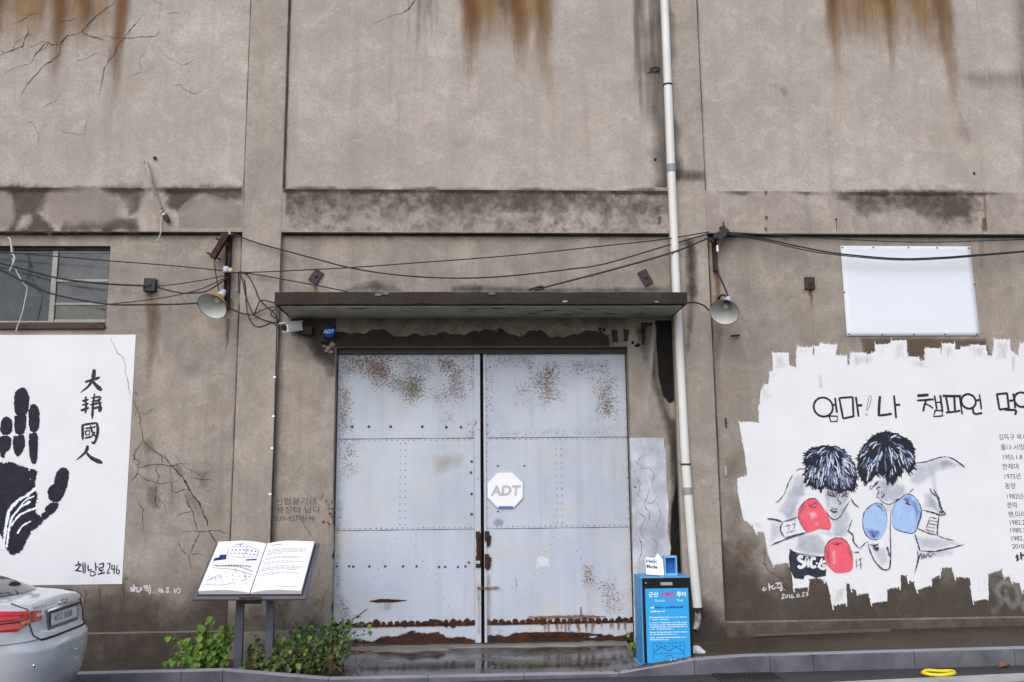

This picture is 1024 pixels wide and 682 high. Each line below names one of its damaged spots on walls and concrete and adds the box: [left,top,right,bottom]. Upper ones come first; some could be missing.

corrosion [116,0,126,40]
crack [1,0,178,95]
peeling [322,301,653,353]
crack [110,338,225,565]
corrosion [333,596,634,644]